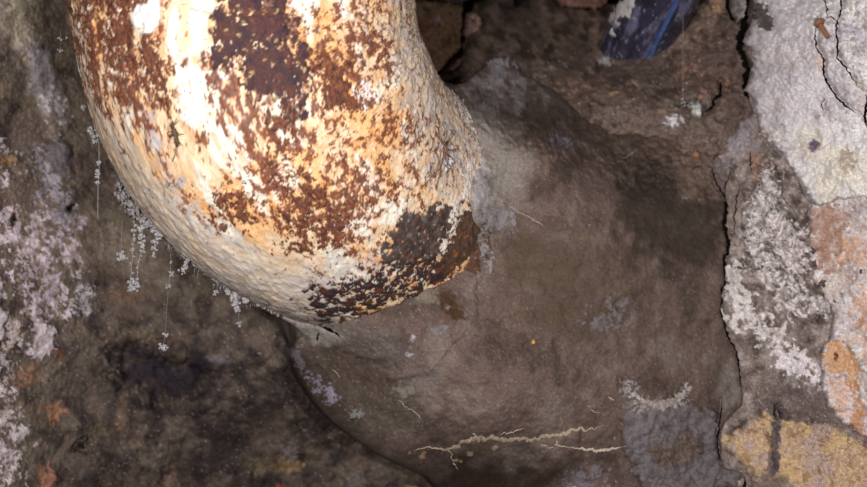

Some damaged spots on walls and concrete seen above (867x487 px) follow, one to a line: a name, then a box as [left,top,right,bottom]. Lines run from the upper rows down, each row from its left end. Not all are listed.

efflorescence [38,85,74,135]
rust [66,0,184,123]
rust [203,0,369,257]
crack [705,0,751,112]
crack [814,0,867,128]
efflorescence [0,138,96,487]
crack [316,326,341,339]
rust [302,200,495,326]
crack [693,150,752,463]
efflorescence [619,380,692,414]